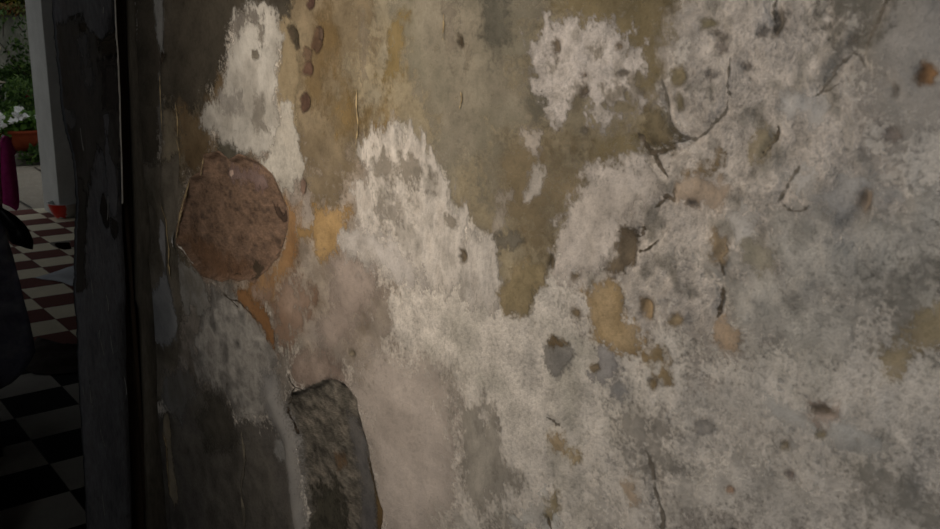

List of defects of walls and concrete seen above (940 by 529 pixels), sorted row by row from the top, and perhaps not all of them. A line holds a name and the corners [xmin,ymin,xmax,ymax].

crack [814,0,888,97]
damp [261,100,306,193]
crack [624,59,732,253]
flaking render [160,0,378,529]
flaking render [606,226,639,278]
crack [644,447,665,529]